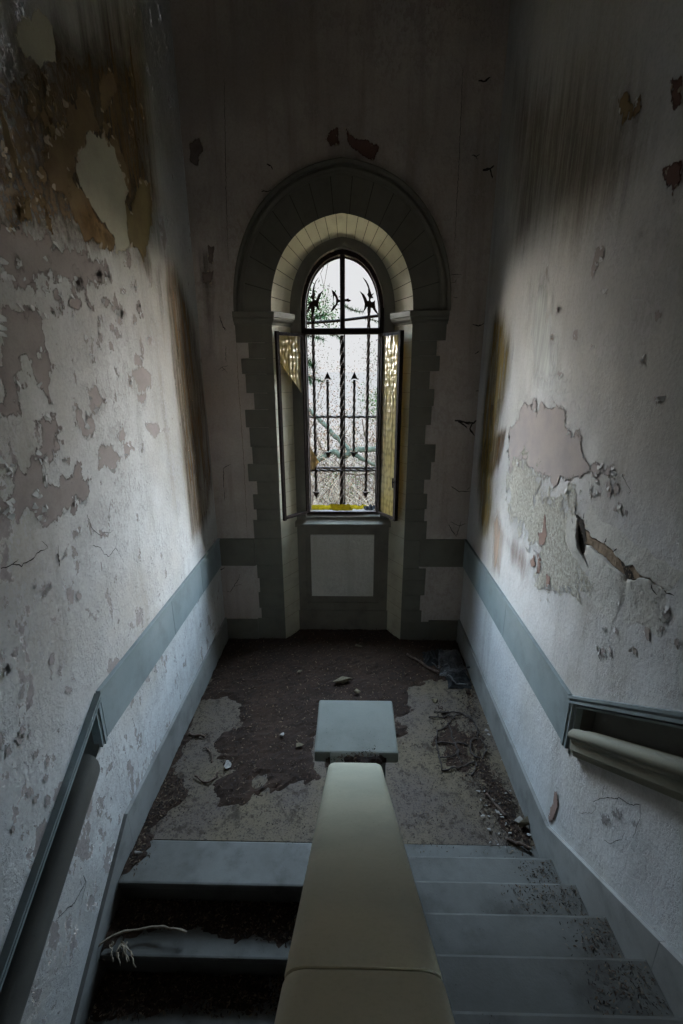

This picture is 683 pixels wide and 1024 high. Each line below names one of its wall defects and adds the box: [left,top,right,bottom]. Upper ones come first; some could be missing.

peeling [15,7,57,69]
water stain [0,5,157,244]
peeling [327,127,379,161]
peeling [670,76,683,111]
peeling [662,159,683,196]
peeling [0,68,153,560]
spalling [501,398,627,604]
crack [1,541,60,569]